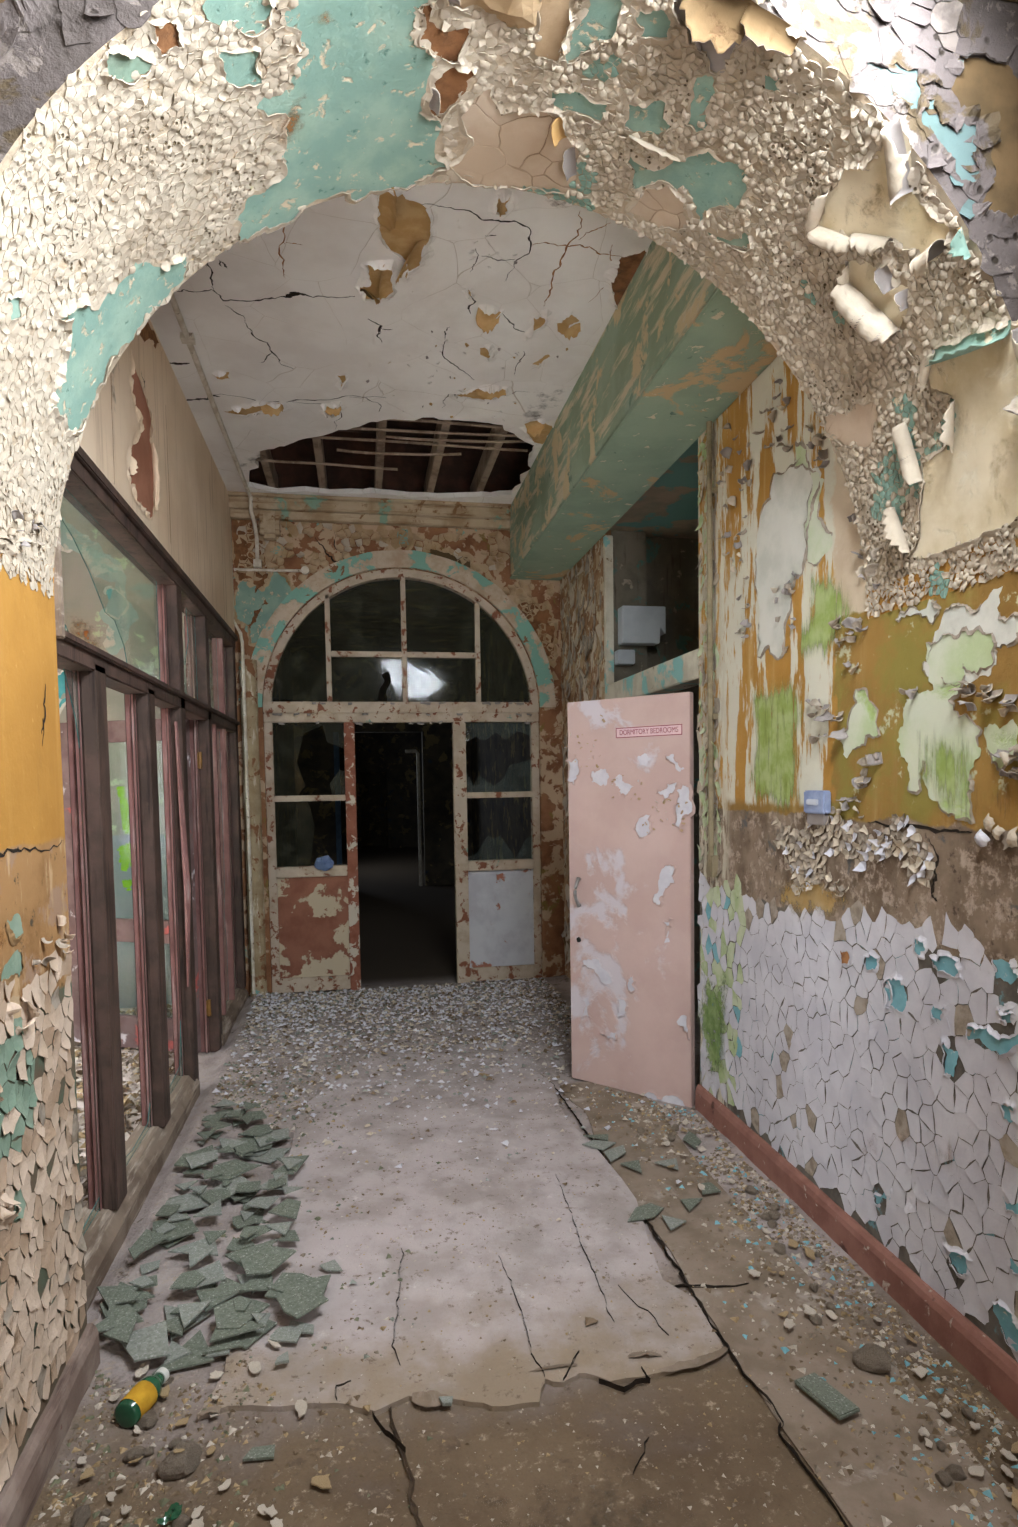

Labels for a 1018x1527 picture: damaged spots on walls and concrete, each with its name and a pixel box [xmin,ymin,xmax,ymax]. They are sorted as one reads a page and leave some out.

crack [111,227,392,539]
peeling [0,0,1018,850]
crack [422,204,616,408]
peeling [231,429,1018,1362]
peeling [0,913,87,1491]
crack [551,1082,611,1165]
flaking render [106,1484,132,1527]
crack [372,1407,424,1527]
crack [499,1256,651,1393]
peeling [628,1346,728,1372]
crack [556,1176,848,1527]
flaking render [911,1365,929,1379]